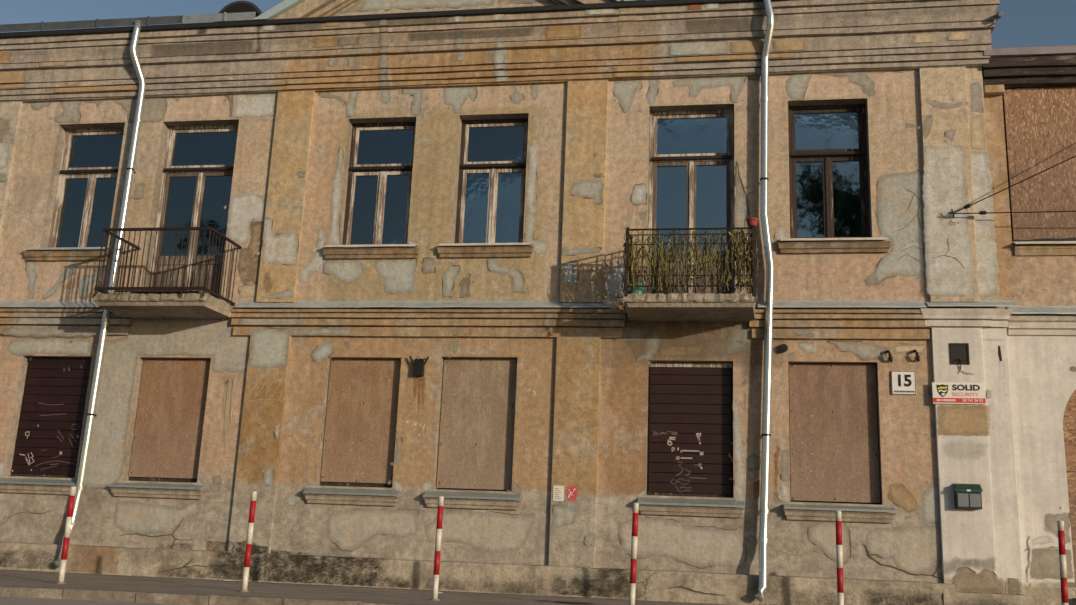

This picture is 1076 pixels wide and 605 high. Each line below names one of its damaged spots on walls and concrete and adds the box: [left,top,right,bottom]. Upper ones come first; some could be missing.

crack [892,189,964,267]
spalling [237,218,287,299]
crack [120,519,216,575]
leakage [171,541,414,588]
leakage [555,568,630,597]